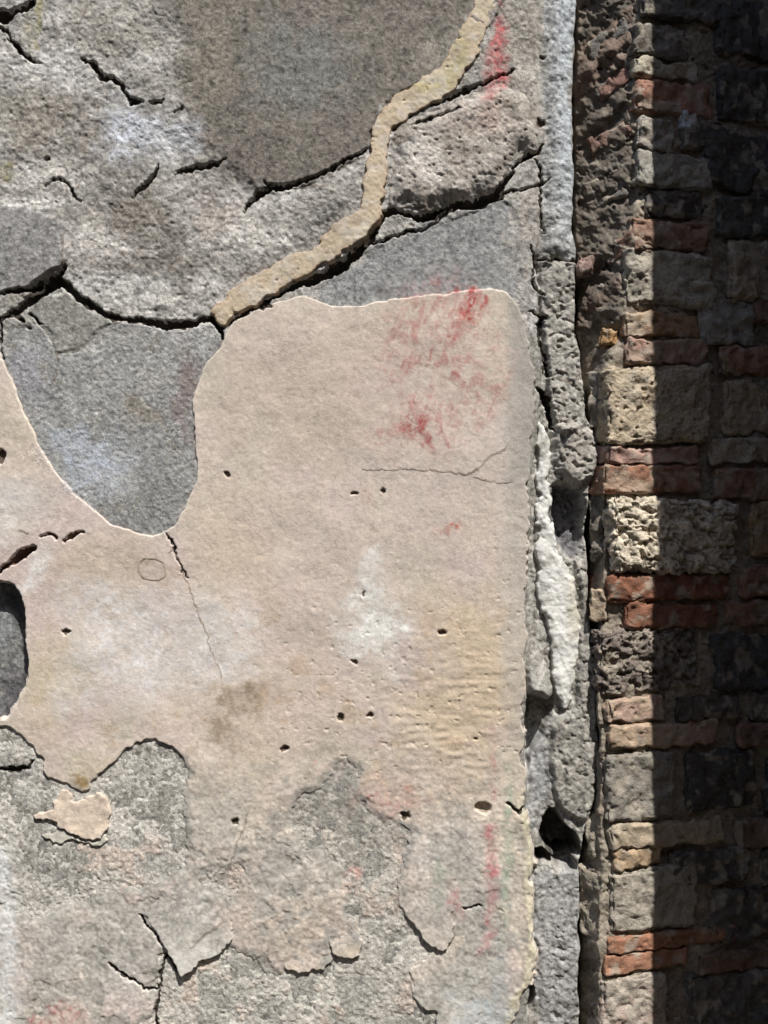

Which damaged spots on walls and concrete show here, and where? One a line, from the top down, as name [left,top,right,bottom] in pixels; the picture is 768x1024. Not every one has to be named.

crack [74,2,183,113]
crack [393,69,514,132]
crack [0,145,579,432]
spalling [0,323,224,536]
crack [365,445,512,484]
crack [167,536,222,679]
spalling [0,583,188,918]
spalling [140,759,453,1024]